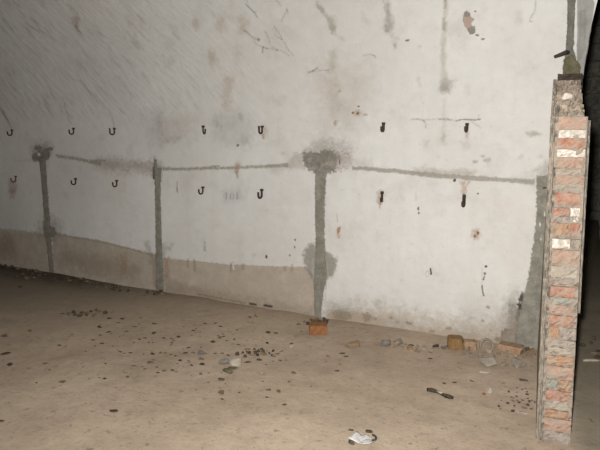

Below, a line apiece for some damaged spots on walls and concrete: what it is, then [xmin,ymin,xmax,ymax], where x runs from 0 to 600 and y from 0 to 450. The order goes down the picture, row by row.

spalling [463,11,485,40]